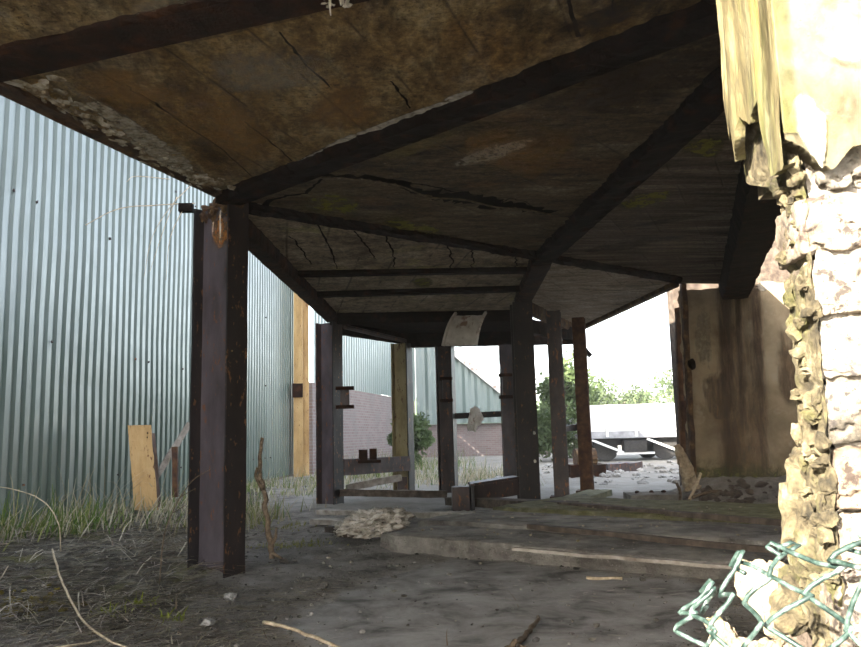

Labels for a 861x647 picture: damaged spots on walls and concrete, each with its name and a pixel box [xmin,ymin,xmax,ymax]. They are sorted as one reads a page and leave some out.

crack [567,0,580,37]
crack [279,32,330,87]
crack [390,81,411,108]
peeling [793,97,826,168]
crack [262,174,558,215]
crack [317,225,337,269]
crack [354,231,396,268]
leakage [704,282,777,477]
leakage [779,333,797,402]